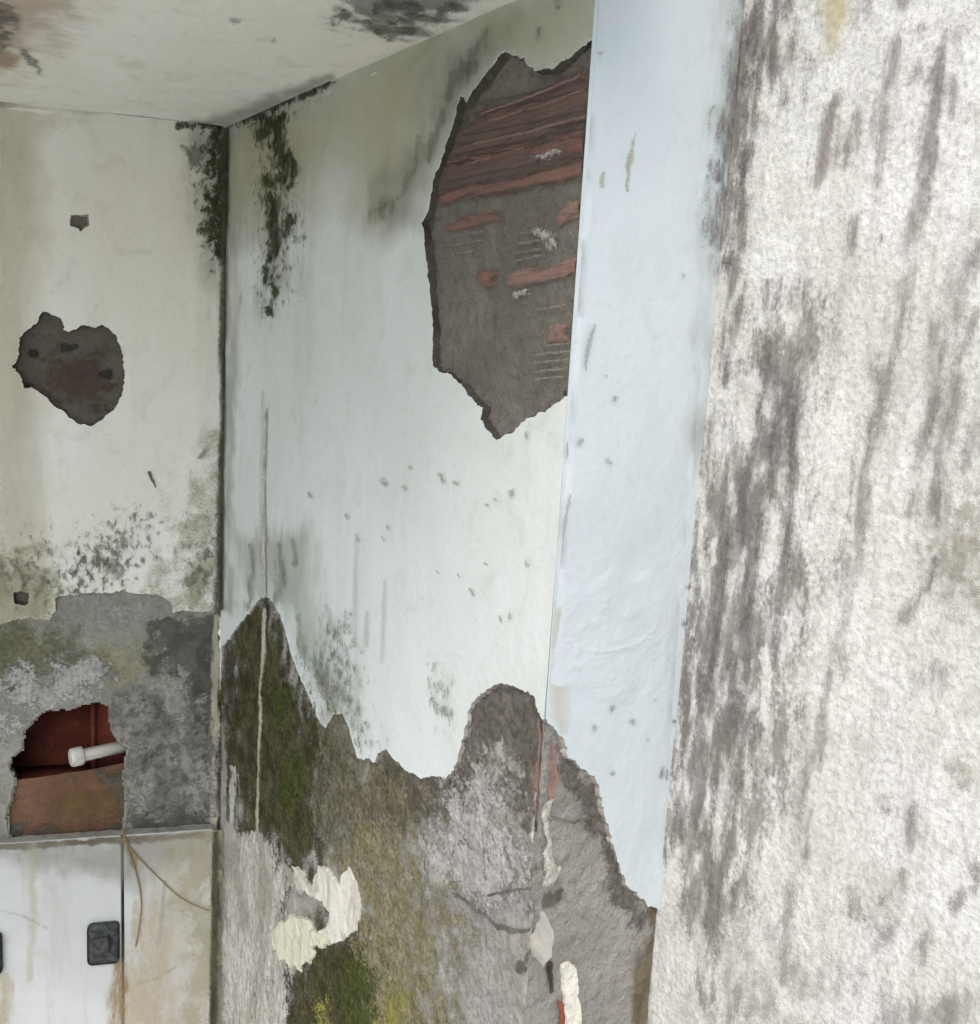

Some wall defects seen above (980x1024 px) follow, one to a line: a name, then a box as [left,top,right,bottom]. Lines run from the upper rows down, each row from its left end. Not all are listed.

flaking render [12,312,125,426]
flaking render [70,214,89,231]
damp [175,0,588,327]
flaking render [422,40,602,440]
damp [659,0,915,1024]
damp [904,26,965,253]
damp [898,280,980,623]
damp [0,484,239,1024]
flaking render [0,590,658,1024]
damp [887,802,921,848]
damp [875,985,971,1024]
damp [949,858,980,912]